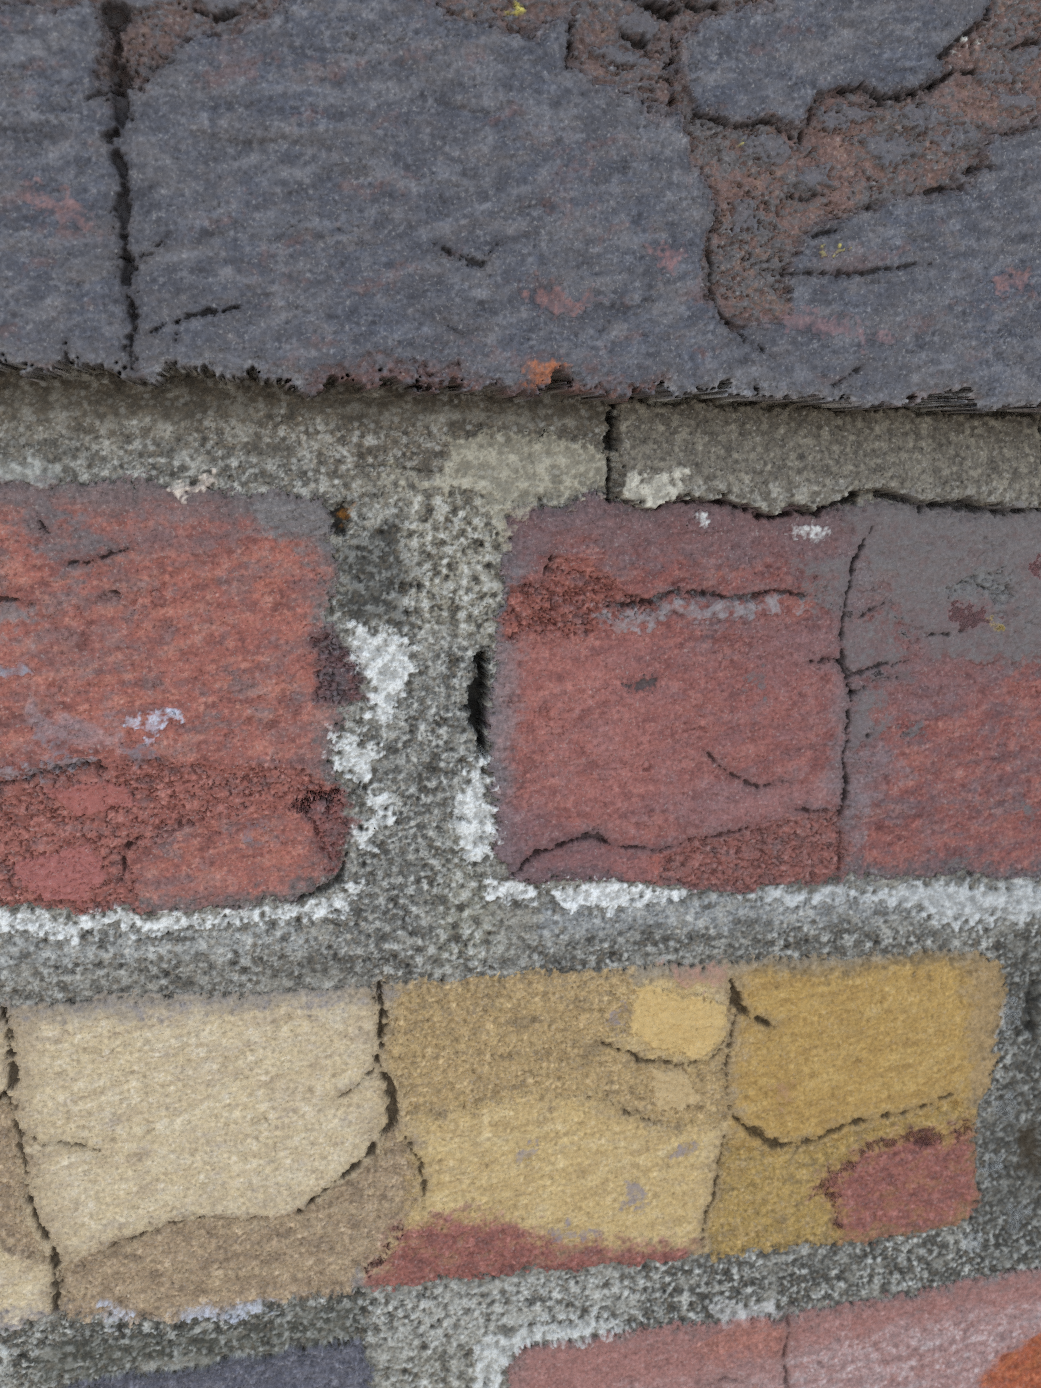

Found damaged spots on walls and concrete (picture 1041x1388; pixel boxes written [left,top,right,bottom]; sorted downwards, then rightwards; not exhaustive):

spalling [0,0,296,99]
crack [84,0,243,376]
spalling [419,0,1041,334]
crack [35,518,133,598]
damp [119,706,185,778]
damp [0,356,613,552]
damp [321,509,428,854]
spalling [490,547,666,653]
damp [623,465,711,547]
crack [509,386,1041,878]
crack [0,979,430,1315]
crack [585,977,956,1250]